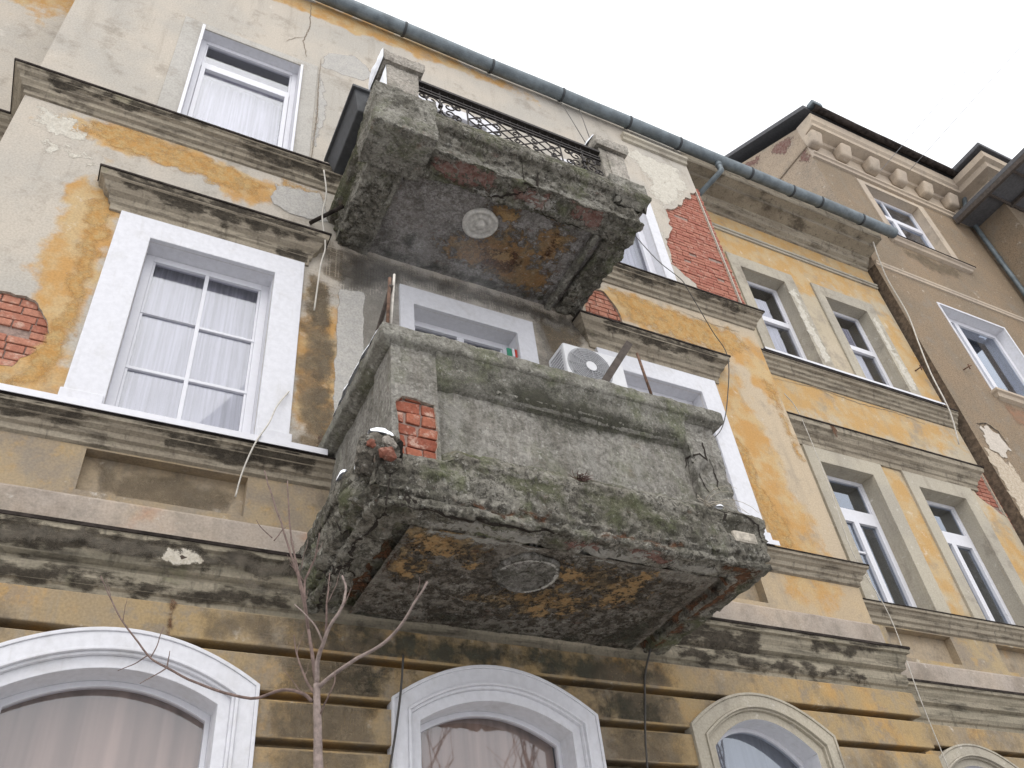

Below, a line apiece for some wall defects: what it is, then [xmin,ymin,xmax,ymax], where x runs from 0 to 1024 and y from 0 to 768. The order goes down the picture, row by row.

crack [287,5,321,158]
water stain [0,394,96,426]
peeling [0,196,113,385]
water stain [0,516,299,640]
spalling [161,548,203,565]
water stain [146,235,581,475]
flaking render [354,396,439,479]
crack [316,473,554,609]
water stain [274,516,720,768]
flaking render [628,148,745,304]
water stain [677,623,888,686]
flaking render [974,425,1024,530]